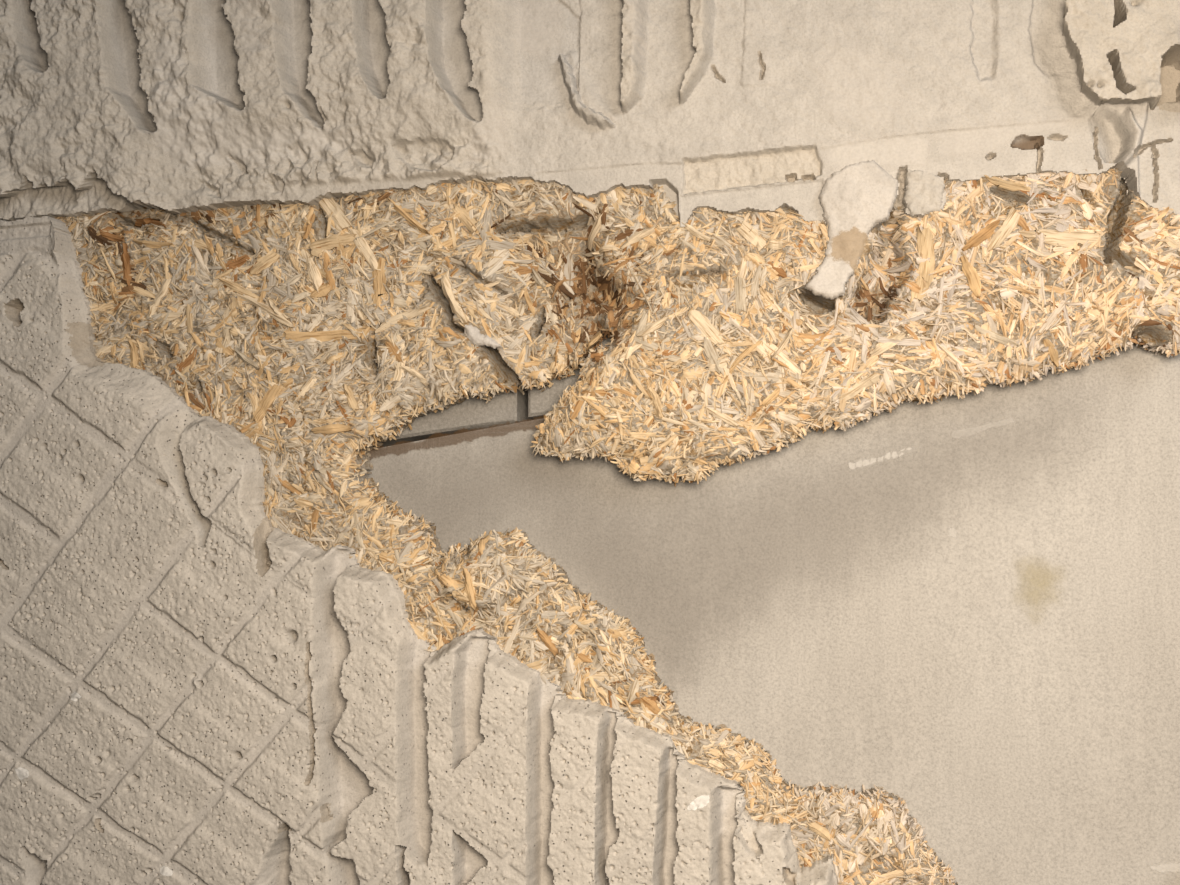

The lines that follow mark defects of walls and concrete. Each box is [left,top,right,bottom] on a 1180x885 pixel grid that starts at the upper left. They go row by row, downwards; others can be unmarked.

spalling [65,322,105,368]
spalling [464,213,646,389]
peeling [785,160,919,325]
crack [304,642,333,823]
crack [277,822,293,834]